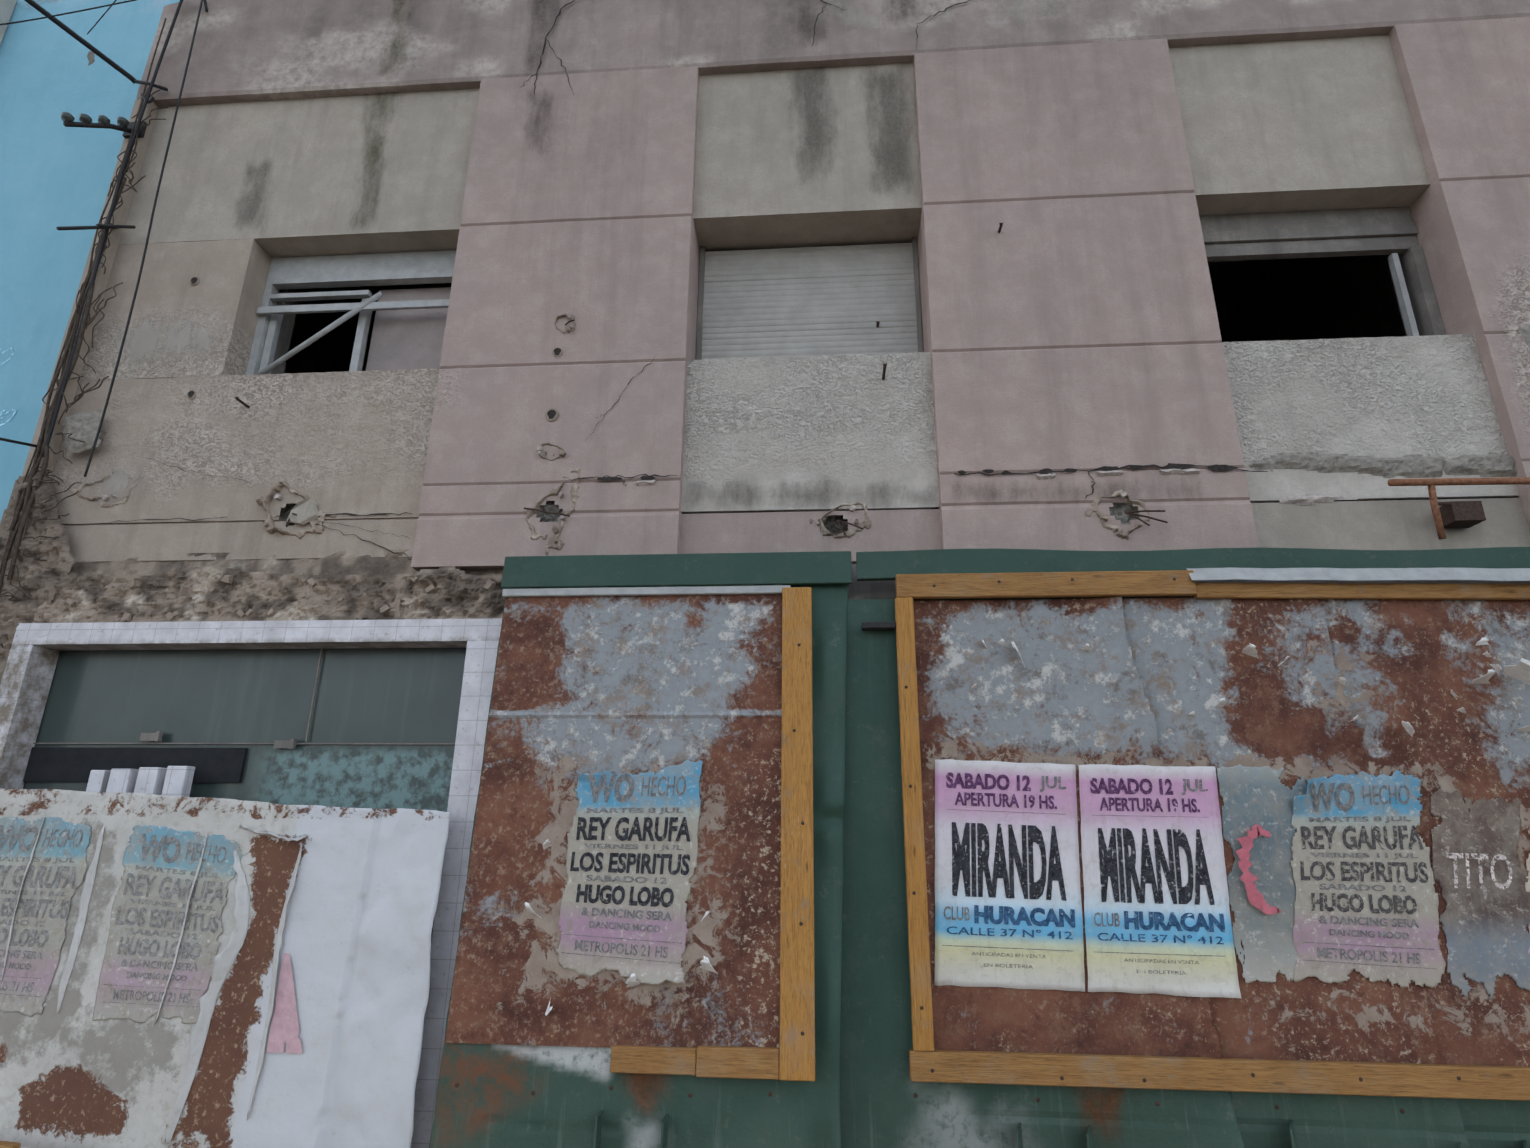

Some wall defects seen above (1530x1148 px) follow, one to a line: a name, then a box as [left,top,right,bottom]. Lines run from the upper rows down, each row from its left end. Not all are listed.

crack [521,0,575,95]
crack [811,0,847,47]
crack [915,0,970,51]
spalling [555,312,576,334]
flaking render [1249,452,1517,478]
spalling [524,442,581,555]
hole [809,502,871,538]
spalling [1085,490,1168,540]
flaking render [1279,493,1357,506]
flaking render [0,471,505,684]